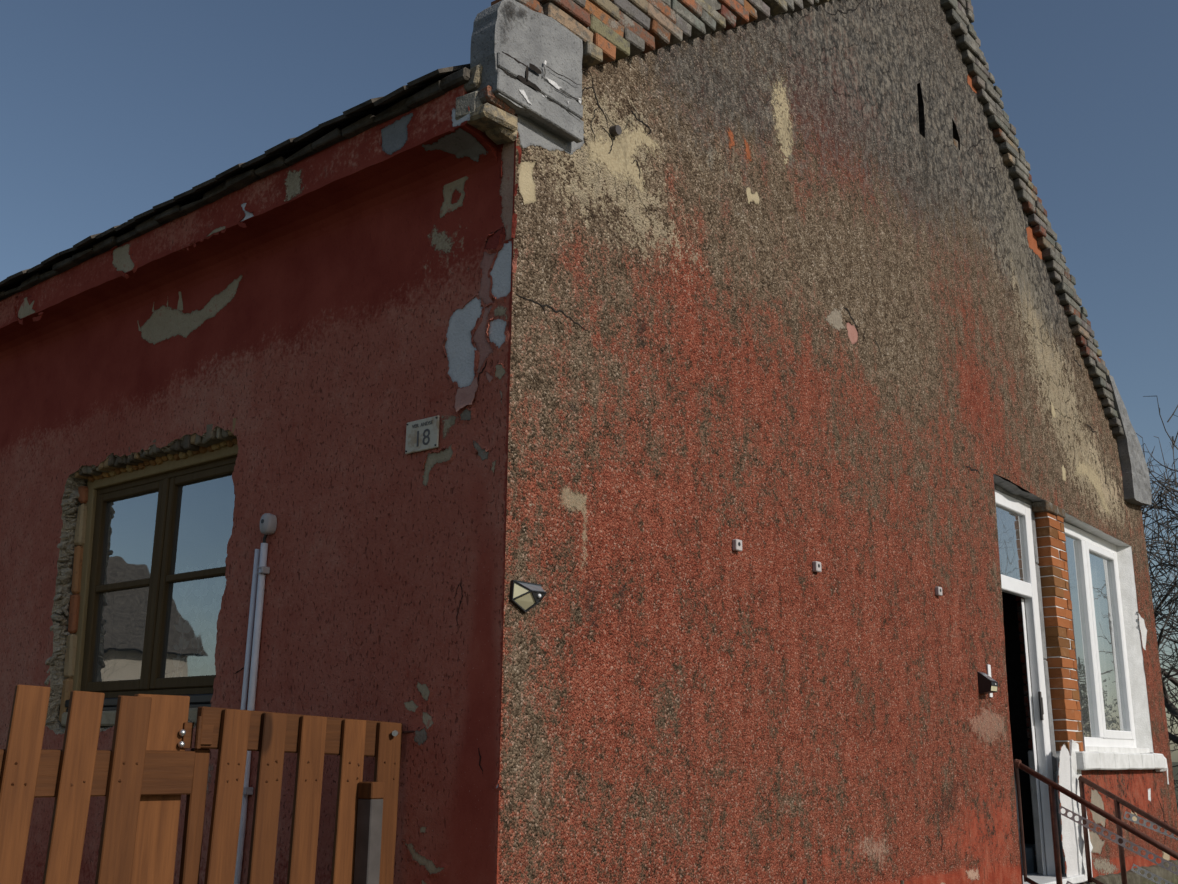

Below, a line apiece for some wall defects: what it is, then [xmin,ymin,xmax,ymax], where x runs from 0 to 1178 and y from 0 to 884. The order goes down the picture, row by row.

flaking render [380,111,415,157]
crack [502,51,651,179]
flaking render [771,79,796,169]
flaking render [111,244,138,279]
peeling [137,272,247,346]
peeling [421,106,661,490]